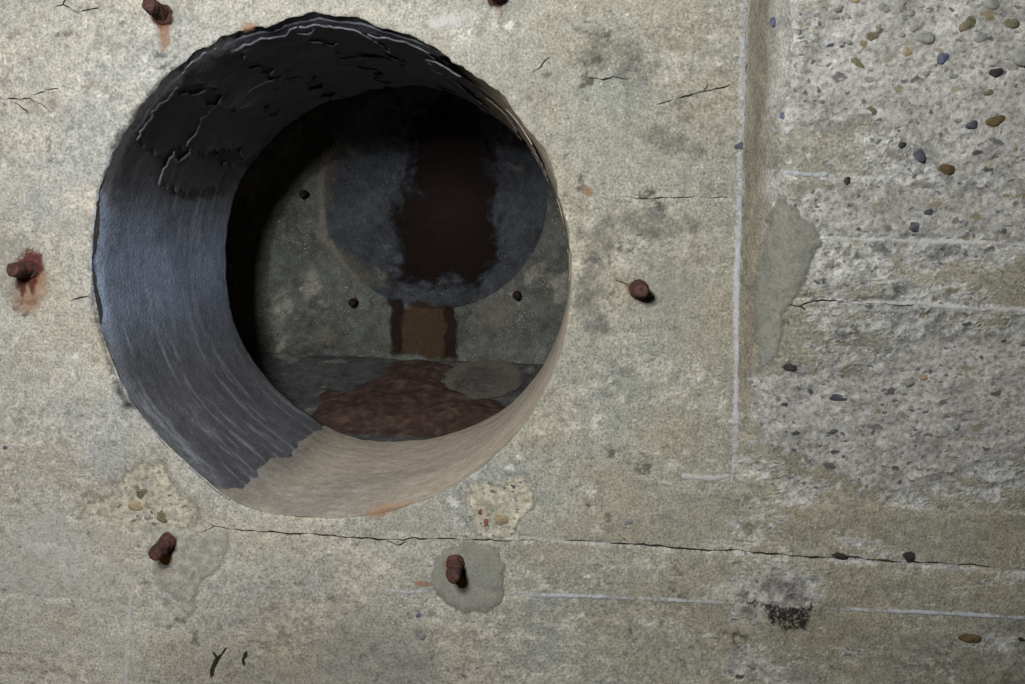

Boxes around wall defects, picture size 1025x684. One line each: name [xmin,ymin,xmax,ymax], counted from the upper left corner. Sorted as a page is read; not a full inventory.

rust [151,4,174,29]
rust [15,249,43,296]
rust [628,279,649,301]
rust [159,531,178,552]
crack [189,518,538,545]
crack [577,538,994,567]